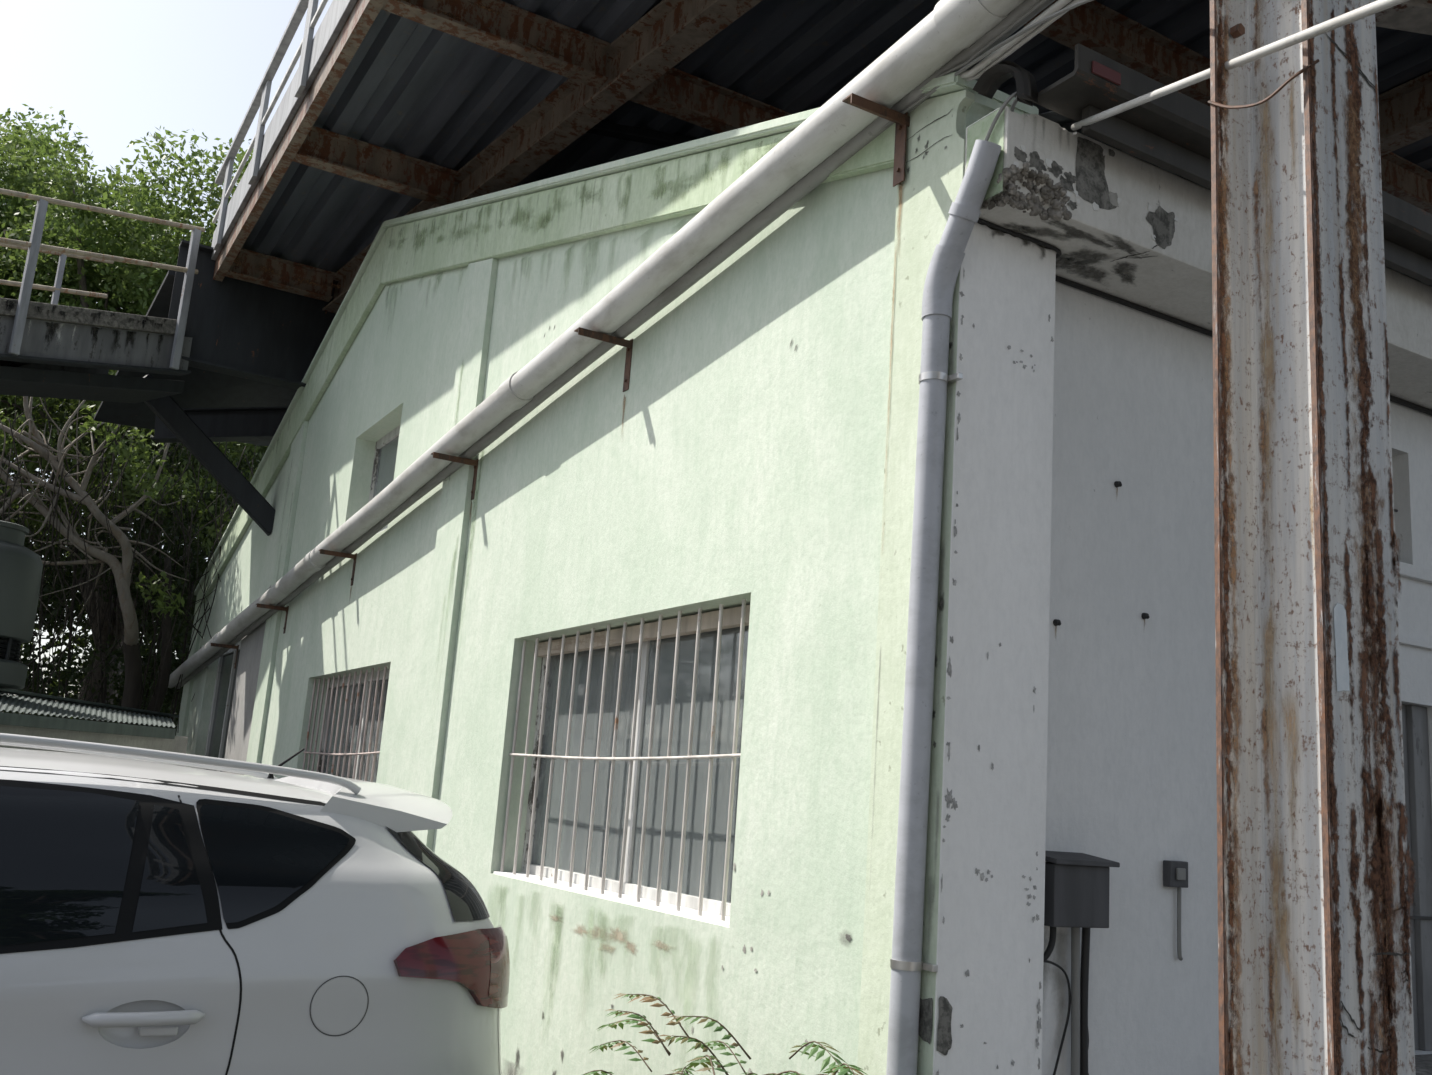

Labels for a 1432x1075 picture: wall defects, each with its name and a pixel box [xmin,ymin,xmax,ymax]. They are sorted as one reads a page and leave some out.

spalling [980,137,1122,221]
peeling [1146,205,1179,249]
rust [1253,101,1272,279]
rust [1259,333,1273,536]
rust [1310,0,1415,1075]
rust [1262,618,1296,817]
peeling [919,996,963,1075]
rust [1269,841,1298,1067]